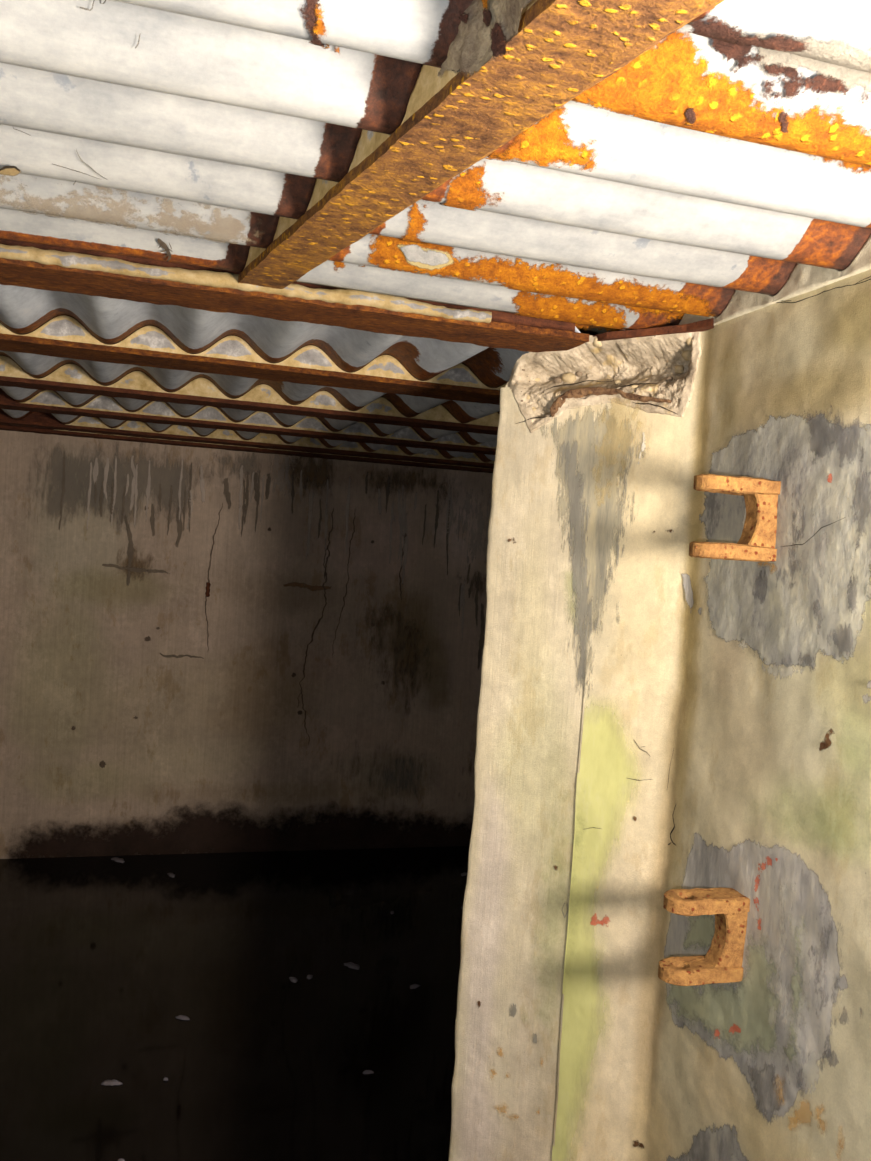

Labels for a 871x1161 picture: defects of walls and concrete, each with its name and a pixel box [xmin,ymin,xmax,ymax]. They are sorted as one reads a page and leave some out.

rust [300,0,340,53]
rust [359,31,871,332]
damp [42,446,205,585]
damp [219,453,270,535]
crack [297,508,356,744]
damp [458,564,486,669]
damp [540,405,646,697]
peeling [682,413,871,679]
peeling [664,833,848,1122]
peeling [667,1124,749,1161]